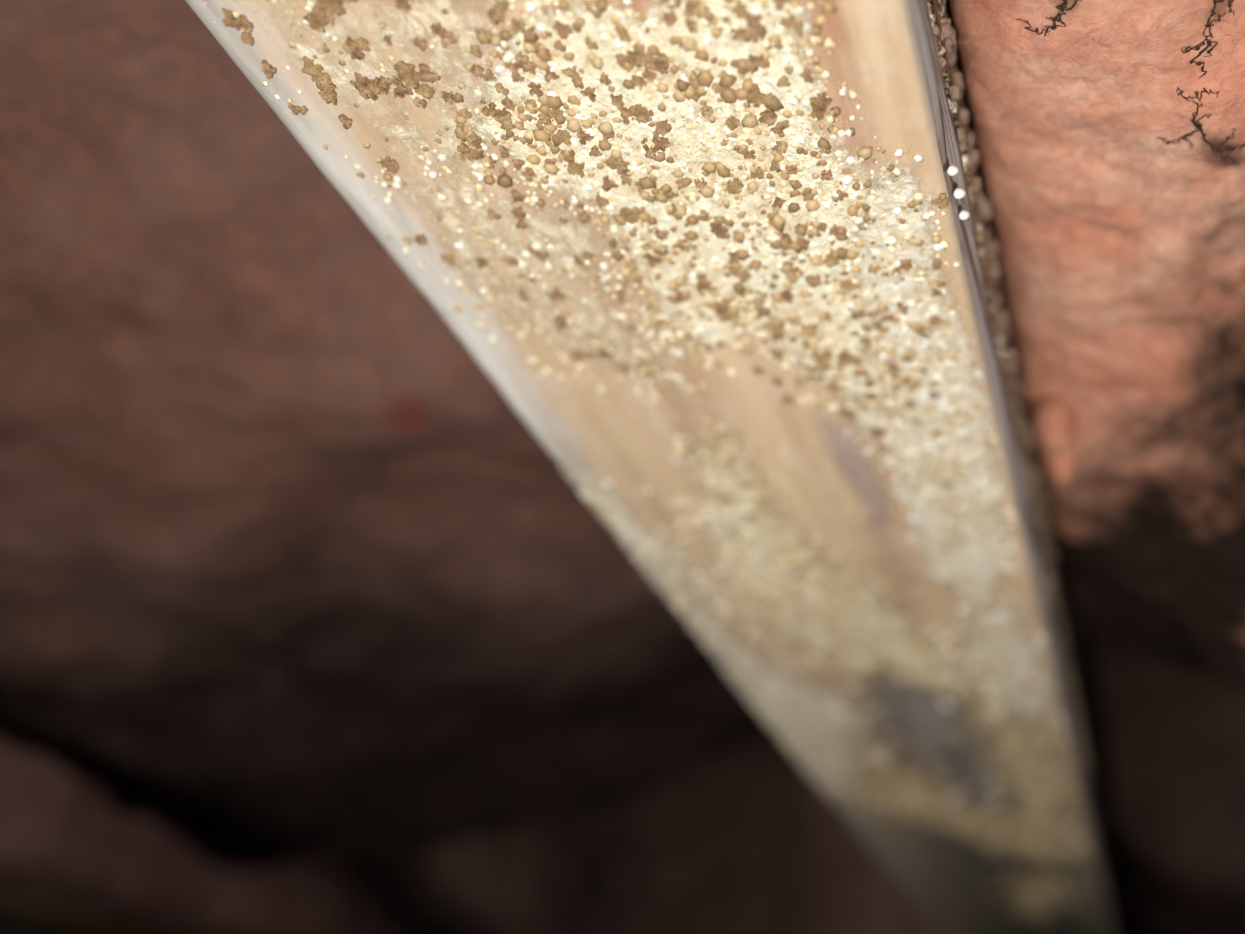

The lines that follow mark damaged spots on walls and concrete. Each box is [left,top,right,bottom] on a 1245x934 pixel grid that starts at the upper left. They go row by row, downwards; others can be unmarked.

leakage [213,0,1099,934]
leakage [1156,0,1245,165]